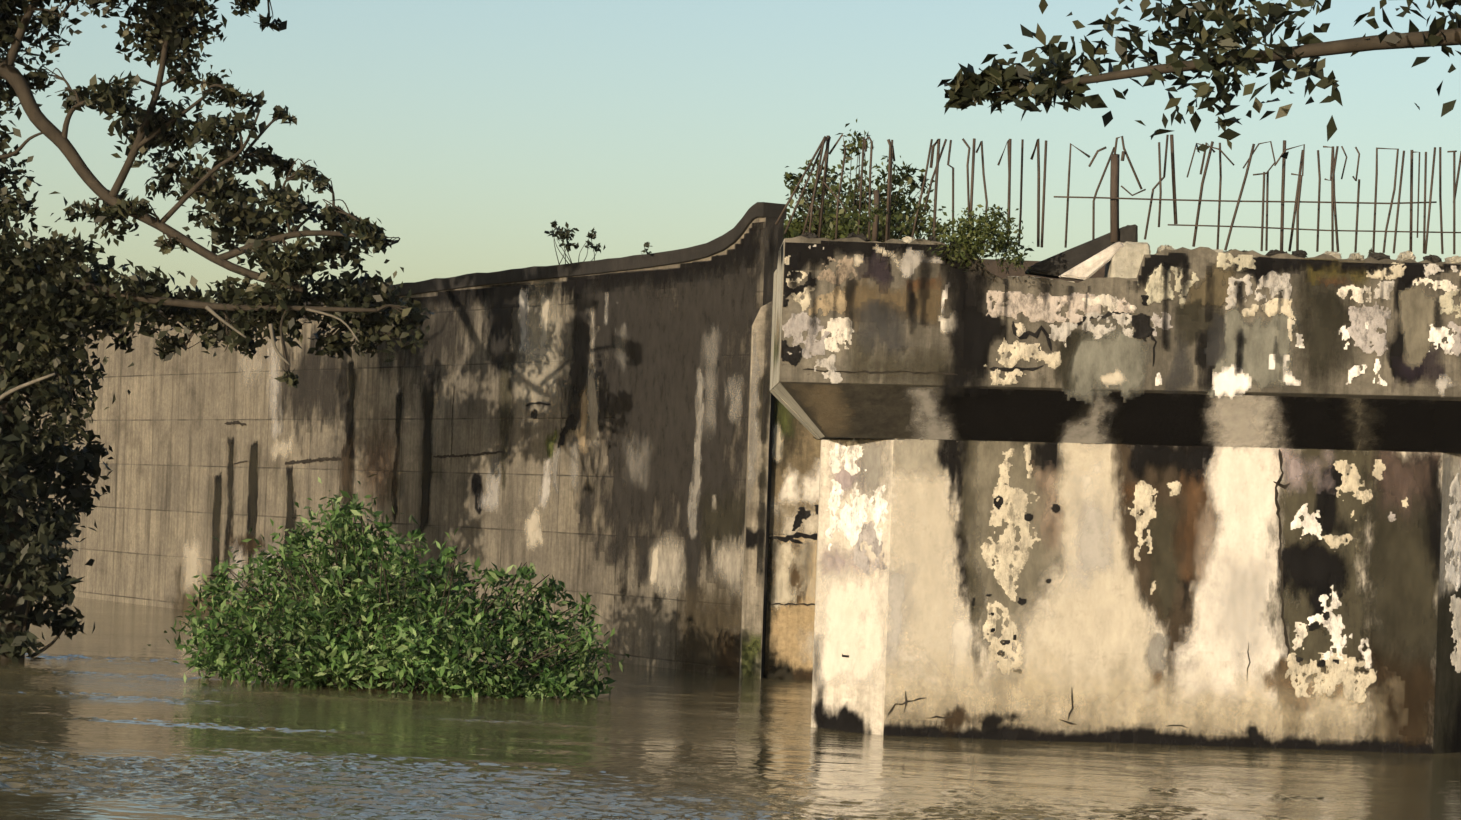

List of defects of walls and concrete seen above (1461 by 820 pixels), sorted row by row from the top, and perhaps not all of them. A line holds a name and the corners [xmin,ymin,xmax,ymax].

peeling [775,133,895,384]
peeling [911,134,1461,386]
damp [342,360,356,458]
damp [576,294,608,450]
peeling [792,438,888,575]
damp [635,244,1353,728]
peeling [971,444,1060,675]
peeling [1128,480,1182,561]
peeling [1291,459,1386,552]
peeling [1285,585,1377,706]